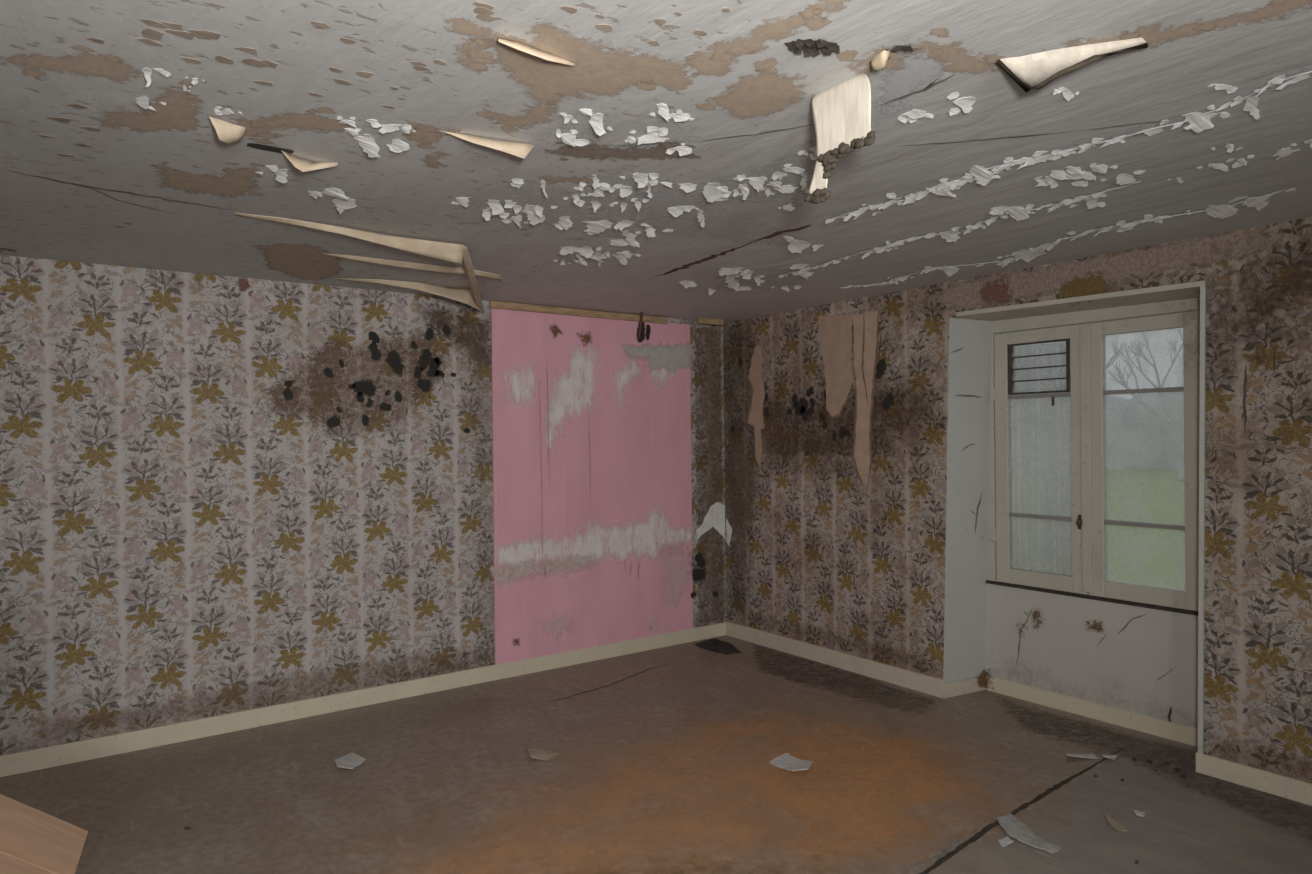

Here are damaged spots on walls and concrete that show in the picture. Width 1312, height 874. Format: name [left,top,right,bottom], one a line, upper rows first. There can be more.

peeling [154,163,288,198]
peeling [1,19,463,168]
peeling [253,244,345,283]
peeling [308,188,357,215]
peeling [410,0,1004,267]
peeling [679,71,1312,311]
water stain [270,307,489,432]
peeling [754,427,763,468]
water stain [691,328,855,622]
water stain [871,358,927,451]